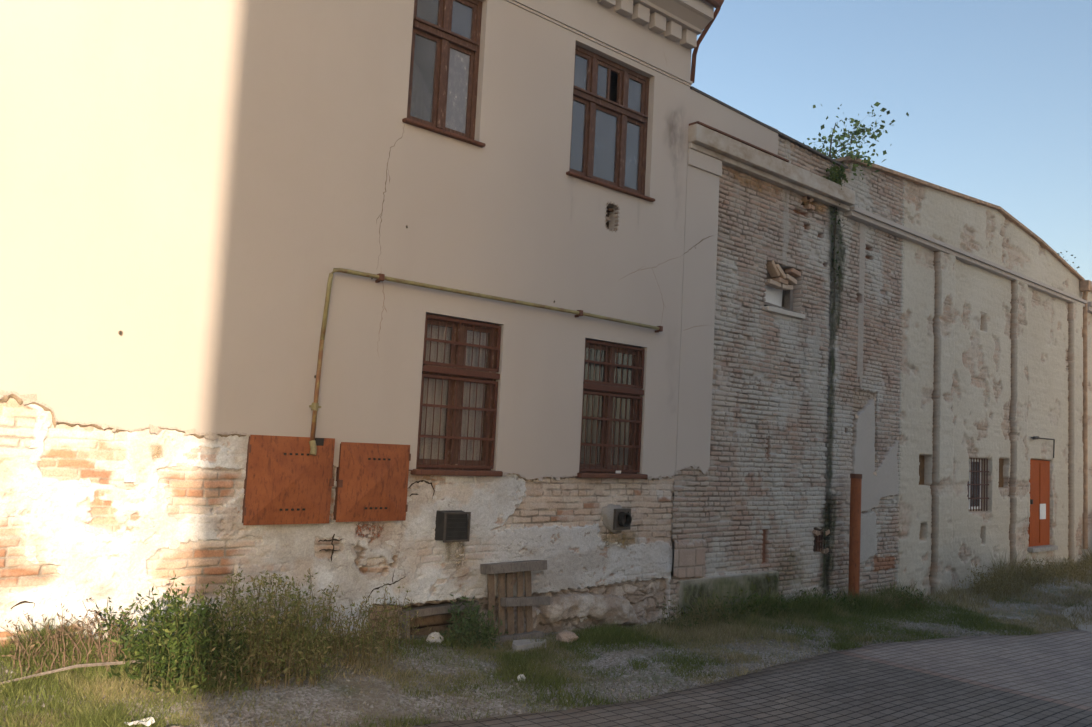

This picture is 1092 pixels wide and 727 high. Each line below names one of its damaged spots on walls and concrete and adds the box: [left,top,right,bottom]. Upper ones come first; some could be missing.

crack [376,124,405,352]
spalling [0,390,247,538]
spalling [407,471,442,506]
spalling [491,471,675,546]
spalling [0,516,66,593]
spalling [139,535,265,608]
spalling [314,535,406,581]
spalling [0,617,114,653]